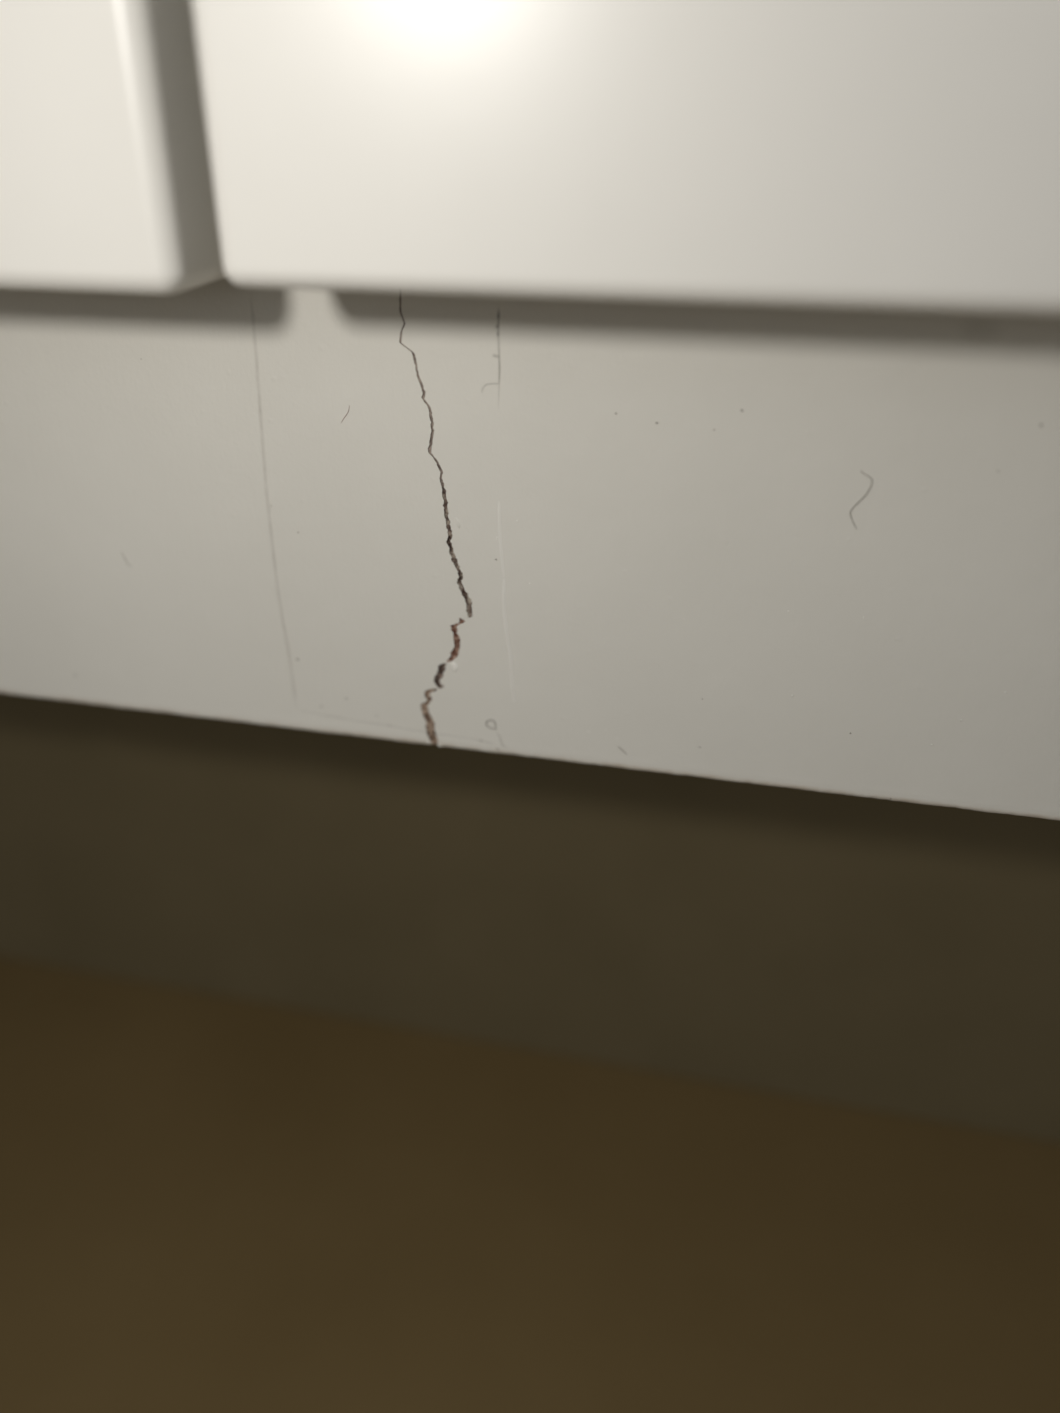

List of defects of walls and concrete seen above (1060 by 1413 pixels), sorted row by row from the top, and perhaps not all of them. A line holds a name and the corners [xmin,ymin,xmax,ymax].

crack [399,293,472,747]